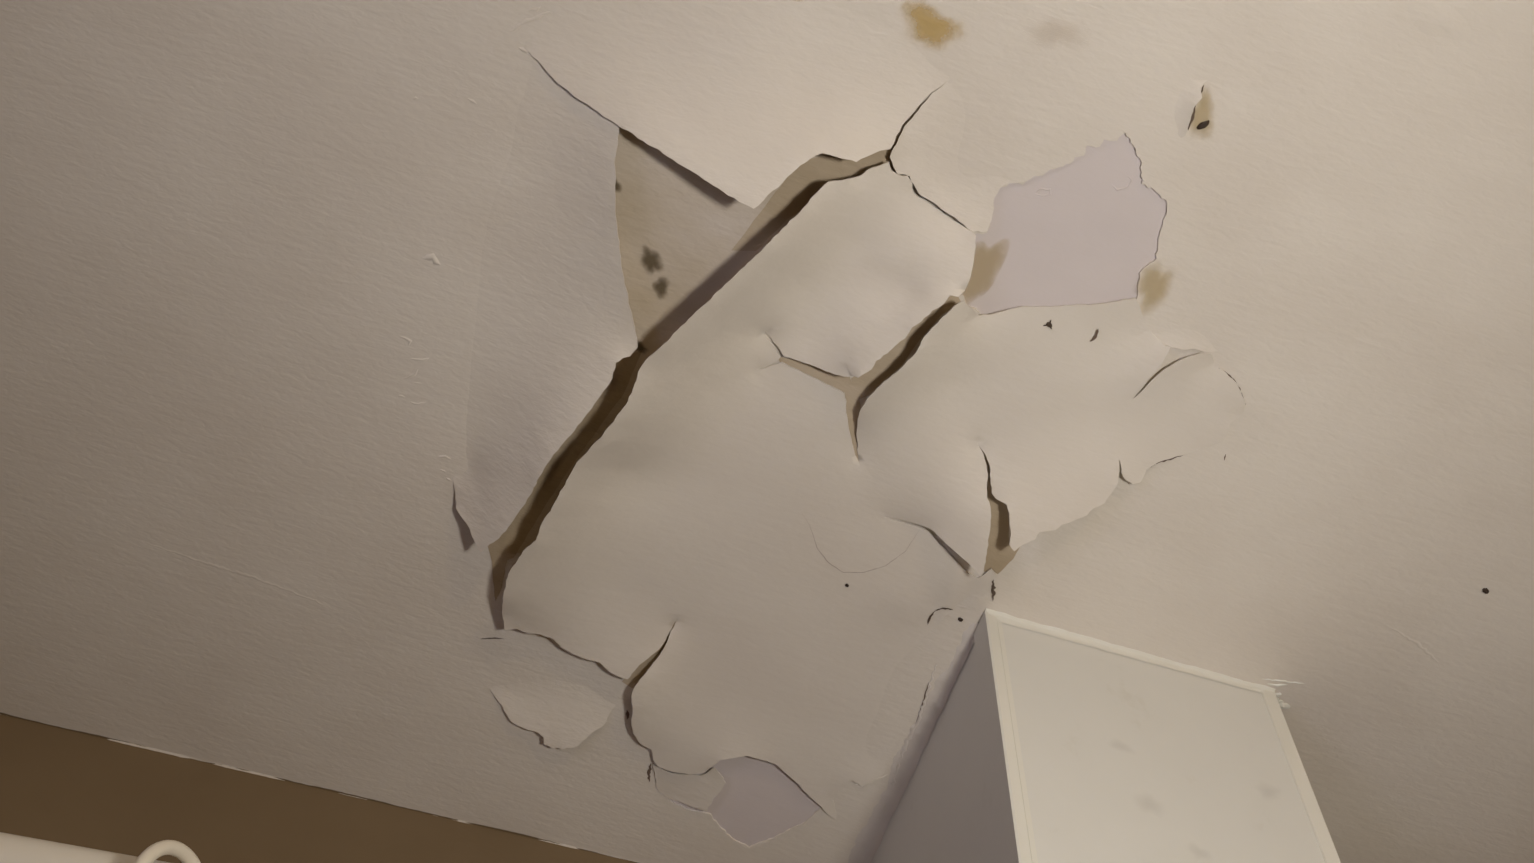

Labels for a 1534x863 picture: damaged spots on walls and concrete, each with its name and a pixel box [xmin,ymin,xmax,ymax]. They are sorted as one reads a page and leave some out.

peeling [453,0,1246,819]